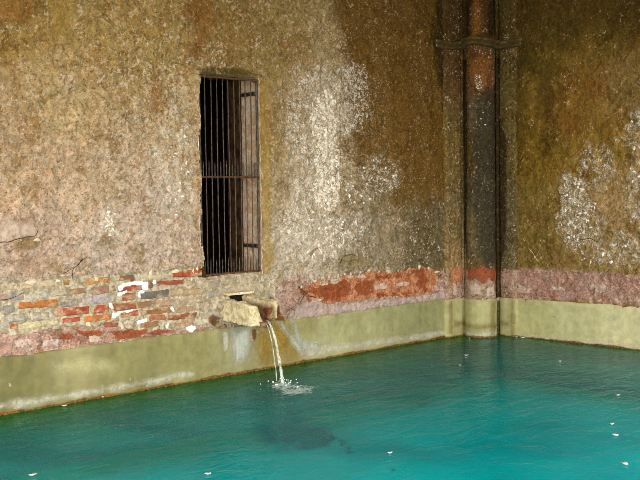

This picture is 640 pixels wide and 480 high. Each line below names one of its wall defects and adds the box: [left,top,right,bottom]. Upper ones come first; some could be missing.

water stain [276,0,444,263]
water stain [556,147,640,267]
flaking render [0,266,276,356]
peeling [284,265,640,320]